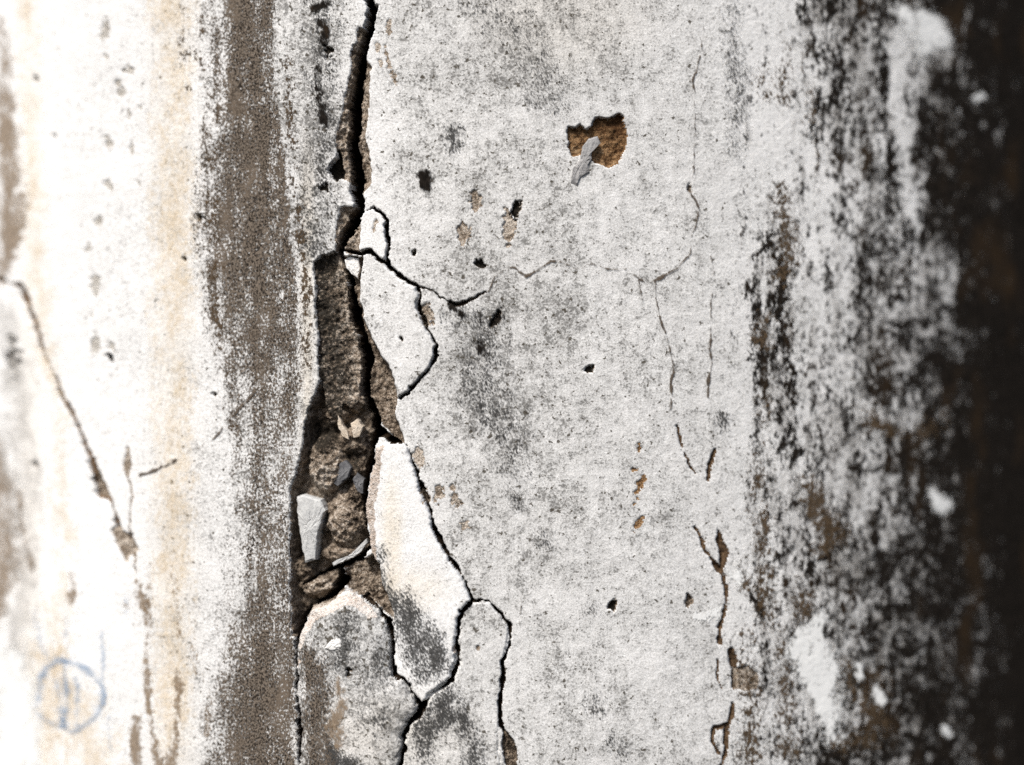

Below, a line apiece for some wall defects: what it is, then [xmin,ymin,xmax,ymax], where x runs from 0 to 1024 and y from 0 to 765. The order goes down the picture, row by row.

crack [0,278,256,574]
leakage [177,0,488,765]
spalling [289,252,386,637]
spalling [419,302,435,326]
peeling [419,483,464,510]
crack [295,0,720,765]
spalling [502,201,523,248]
spalling [567,114,628,185]
leakage [718,3,775,176]
leakage [727,0,1024,765]
spalling [502,728,518,765]
crack [693,526,759,765]